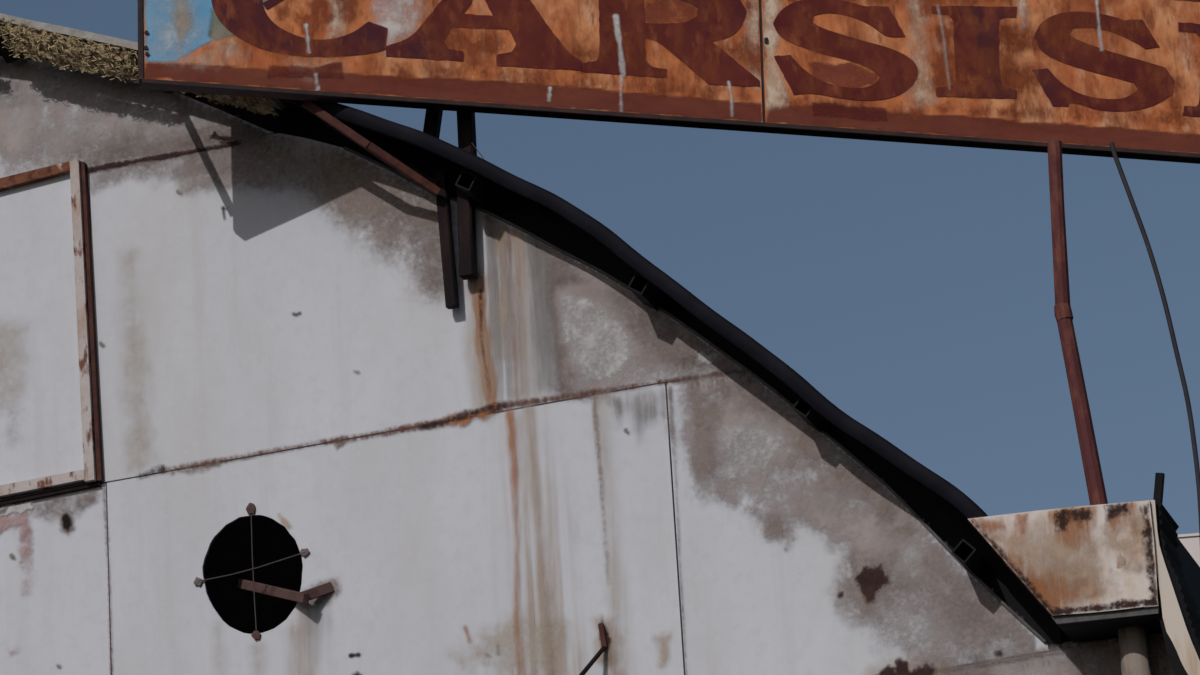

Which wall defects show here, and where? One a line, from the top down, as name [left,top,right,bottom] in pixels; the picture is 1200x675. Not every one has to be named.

rust [87,140,242,172]
leakage [0,59,442,288]
rust [139,273,721,489]
leakage [486,215,1122,675]
rust [515,561,563,675]
spalling [838,558,906,610]
rust [976,503,1158,615]
leakage [1147,633,1175,675]